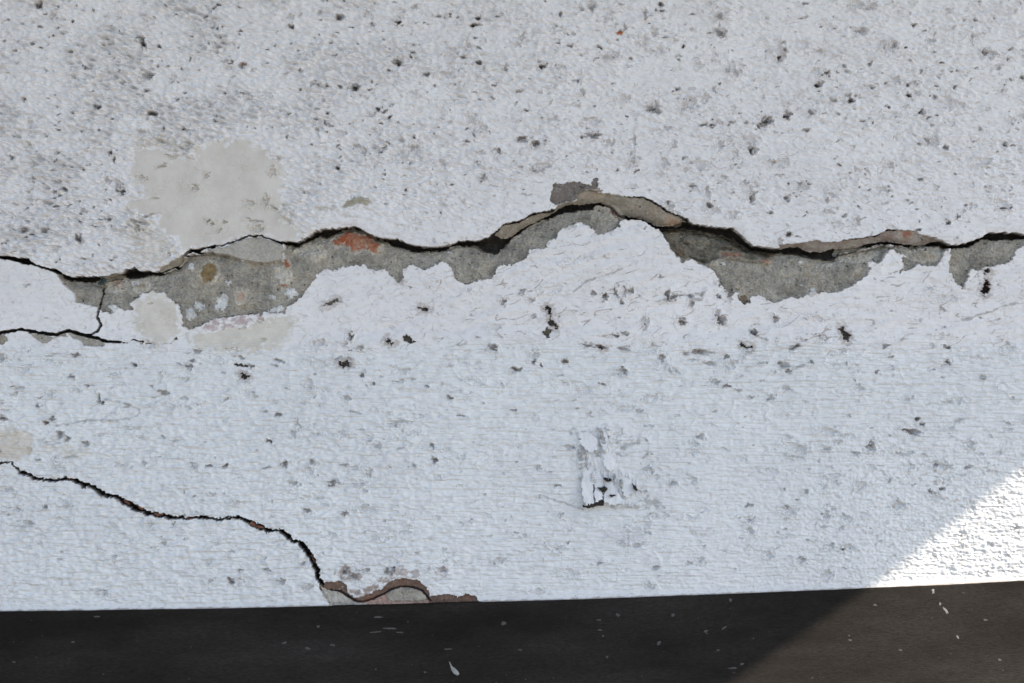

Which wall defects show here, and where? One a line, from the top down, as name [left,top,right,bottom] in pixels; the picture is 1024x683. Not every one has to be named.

crack [0,328,148,344]
flaking render [60,178,620,380]
crack [1,188,1024,305]
crack [747,327,770,342]
flaking render [660,229,1024,305]
crack [960,301,1024,322]
crack [0,462,325,585]
flaking render [319,562,478,606]